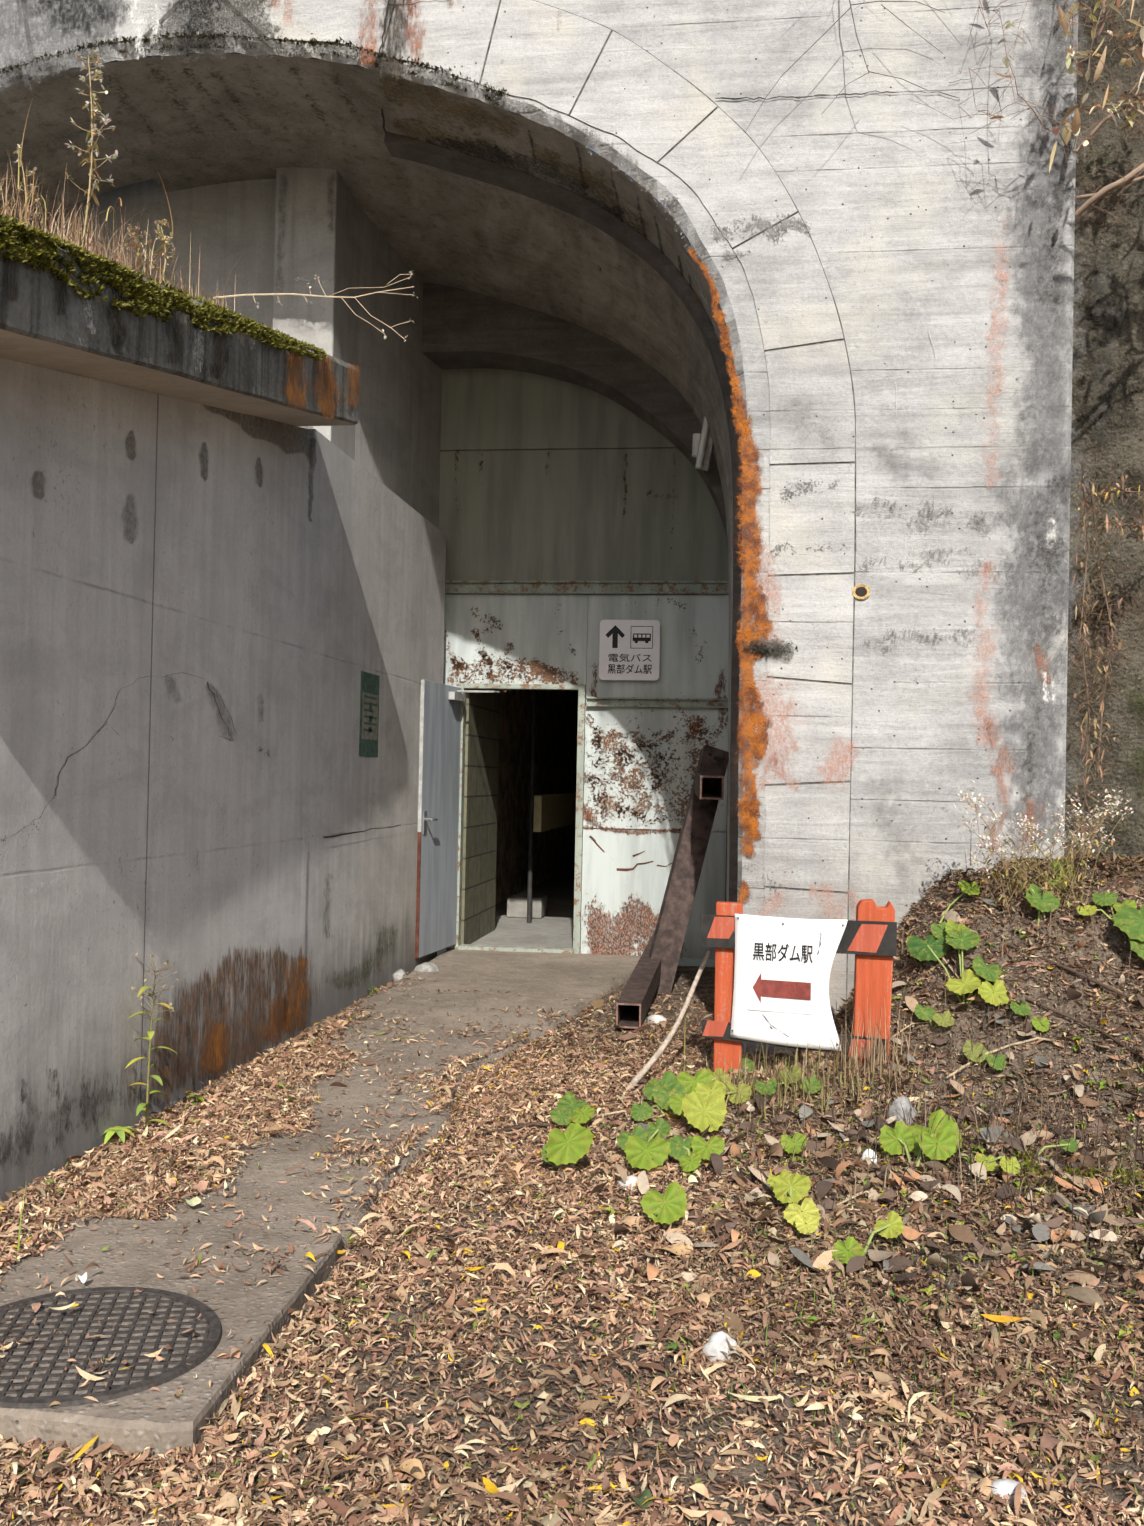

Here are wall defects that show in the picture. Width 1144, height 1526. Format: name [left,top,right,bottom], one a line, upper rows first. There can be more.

damp [0,0,328,133]
crack [715,78,974,100]
corrosion [285,352,360,419]
damp [999,0,1132,845]
corrosion [679,248,796,858]
corrosion [470,607,503,635]
crack [1,672,237,841]
corrosion [583,803,681,835]
corrosion [582,894,659,956]
corrosion [738,880,750,904]
corrosion [149,947,320,1106]
damp [0,1070,165,1164]